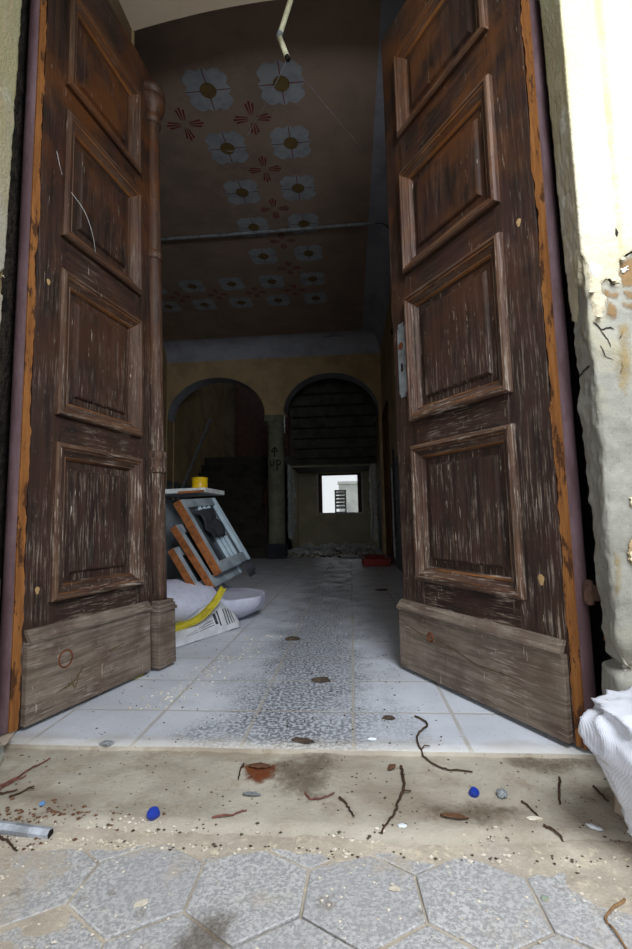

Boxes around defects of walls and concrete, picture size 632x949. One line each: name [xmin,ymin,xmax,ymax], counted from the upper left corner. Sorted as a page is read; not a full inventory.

flaking render [574,251,632,695]